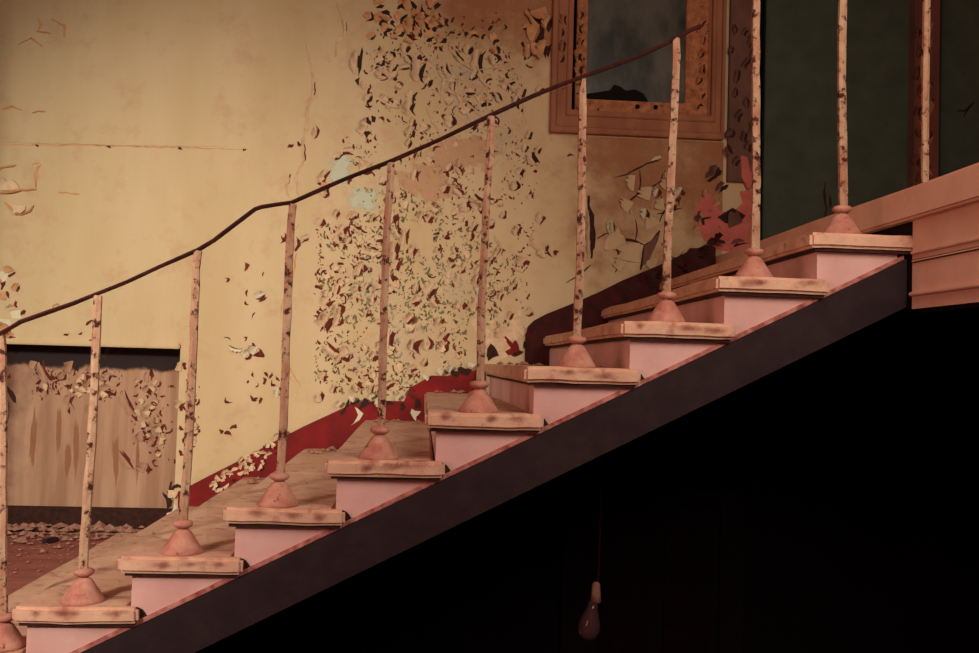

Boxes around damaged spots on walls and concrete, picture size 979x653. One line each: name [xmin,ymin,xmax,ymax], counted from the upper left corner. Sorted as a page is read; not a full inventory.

peeling [521,7,585,94]
crack [285,2,347,200]
crack [0,139,246,151]
spalling [604,19,752,292]
crack [280,224,301,275]
flaking render [281,0,559,425]
peeling [0,265,26,339]
peeling [244,290,267,317]
peeling [225,336,265,360]
peeling [29,359,201,475]
peeling [247,372,280,404]